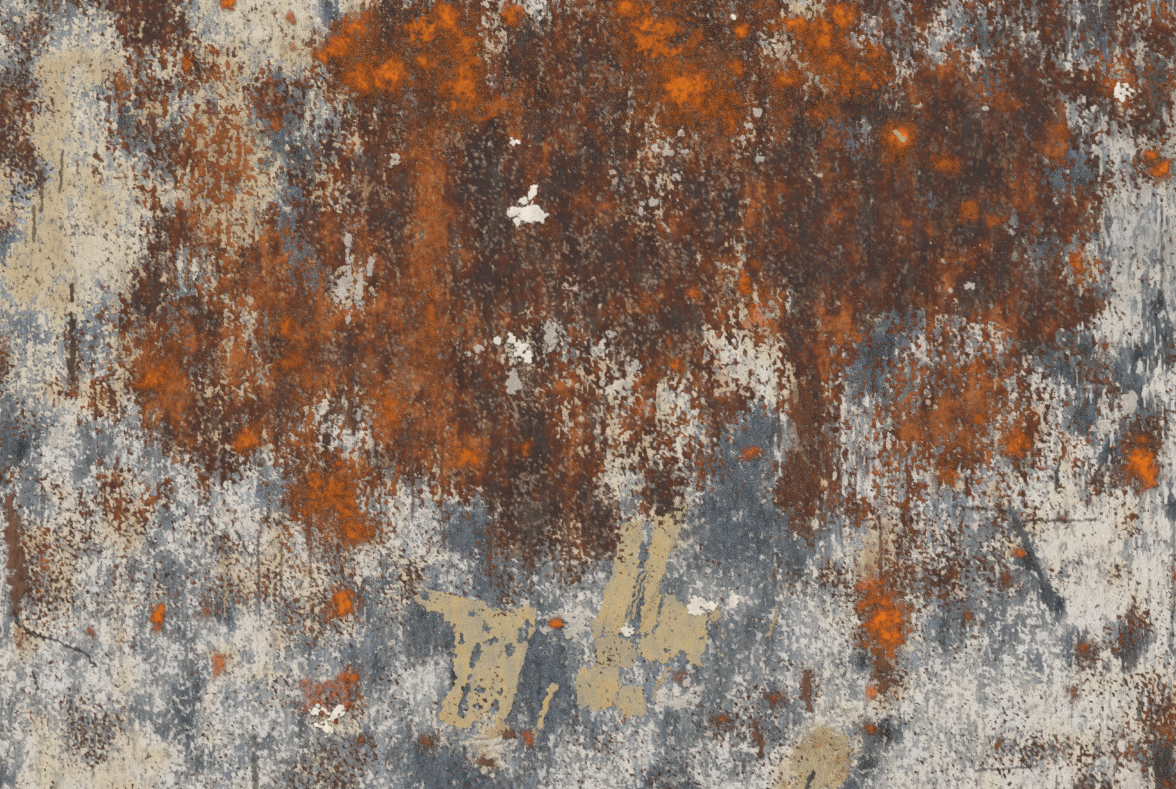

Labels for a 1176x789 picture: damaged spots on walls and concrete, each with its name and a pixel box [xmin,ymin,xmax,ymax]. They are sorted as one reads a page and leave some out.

peeling [445,0,621,101]
peeling [436,114,539,190]
peeling [556,58,717,299]
peeling [493,185,549,283]